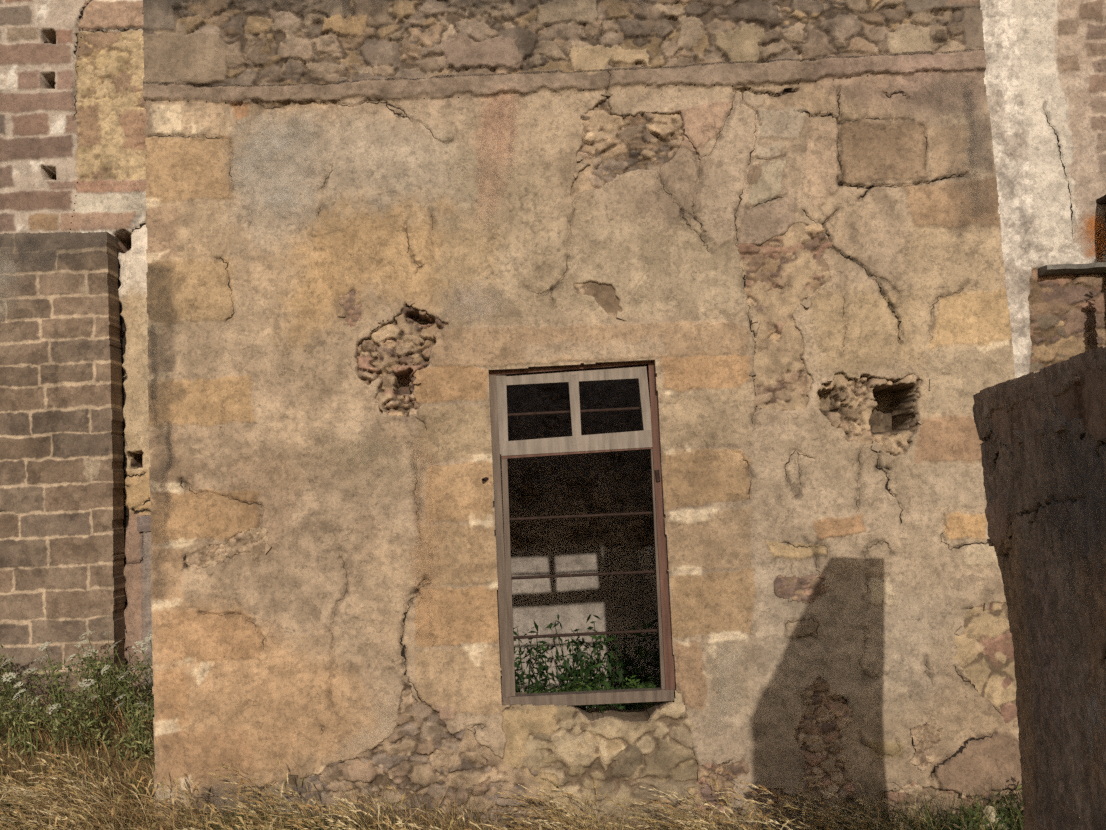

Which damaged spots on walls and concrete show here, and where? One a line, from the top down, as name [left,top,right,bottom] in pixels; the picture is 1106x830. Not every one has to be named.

crack [74,0,142,115]
spalling [571,93,683,197]
crack [660,88,964,251]
crack [1043,108,1074,240]
spalling [337,290,448,420]
spalling [573,282,629,321]
spalling [736,222,935,456]
crack [802,209,902,352]
crack [399,579,430,705]
spalling [952,603,1017,724]
spalling [247,675,1024,830]
crack [930,705,1001,786]